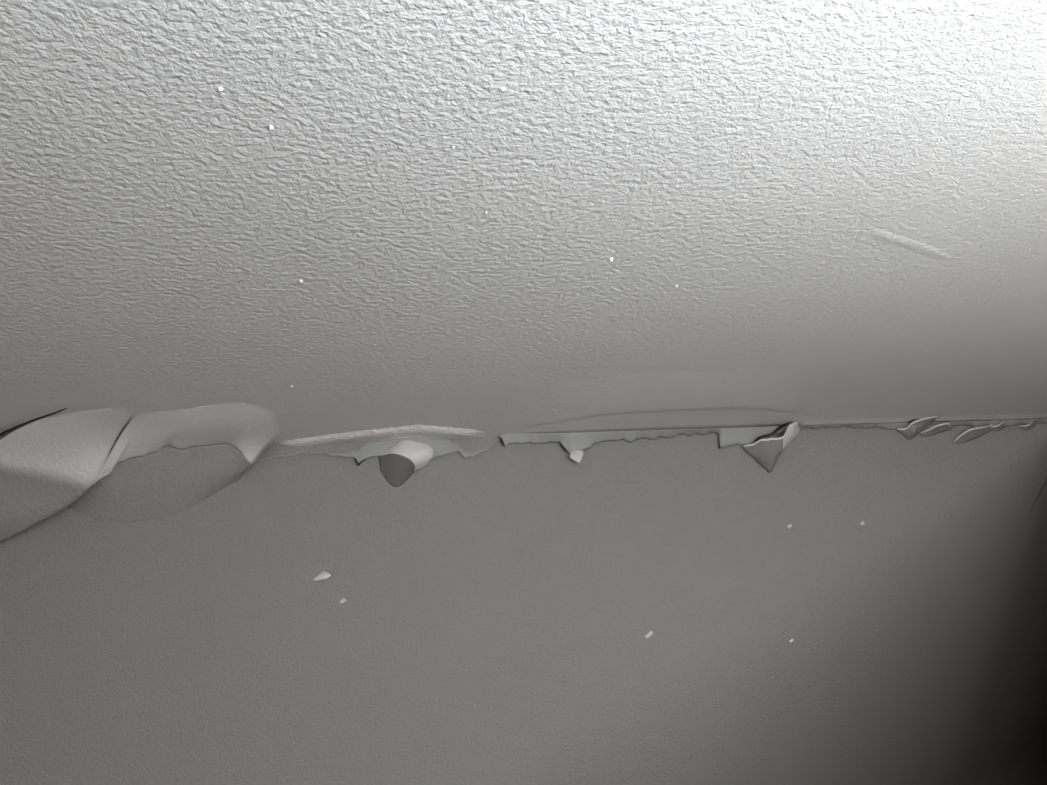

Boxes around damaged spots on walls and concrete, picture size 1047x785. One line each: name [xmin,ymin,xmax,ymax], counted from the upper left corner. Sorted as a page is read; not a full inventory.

peeling [379,440,433,487]
peeling [570,450,583,463]
peeling [743,413,1047,473]